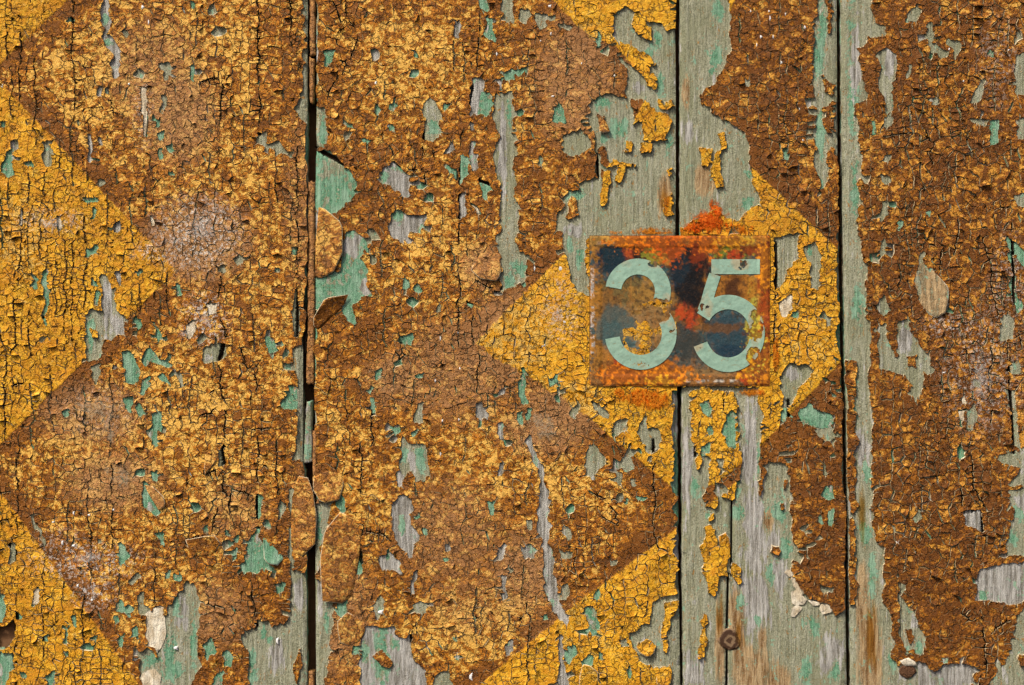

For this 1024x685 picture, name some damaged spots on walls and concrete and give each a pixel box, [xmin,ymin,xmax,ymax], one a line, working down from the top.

crack [0,215,32,570]
crack [63,221,88,347]
crack [185,277,279,543]
crack [254,0,262,136]
peeling [113,470,453,685]
peeling [294,0,372,329]
peeling [422,67,529,293]
peeling [551,0,759,295]
rust [685,200,751,233]
peeling [619,0,983,685]
crack [933,206,1021,452]
peeling [975,388,1024,685]